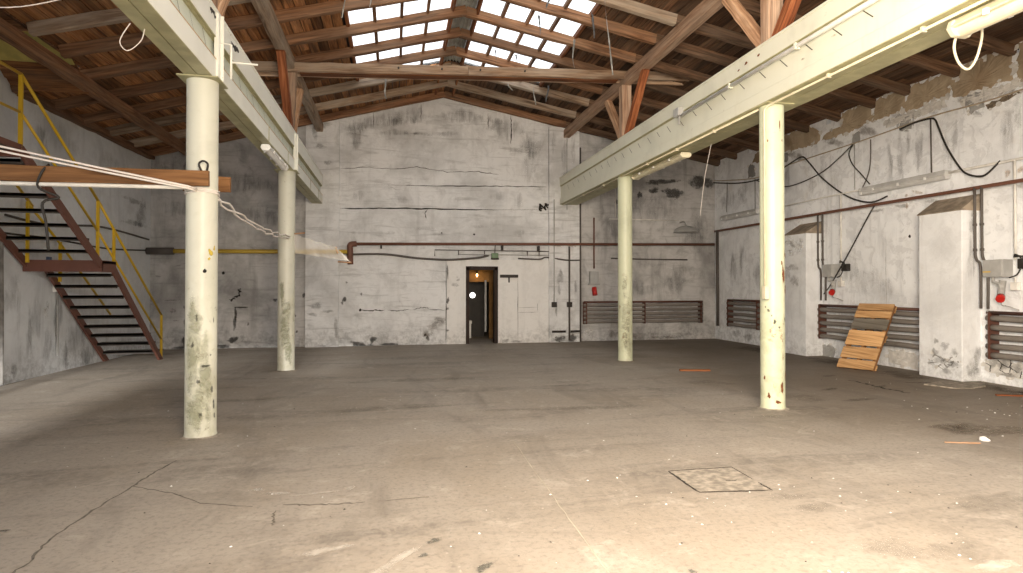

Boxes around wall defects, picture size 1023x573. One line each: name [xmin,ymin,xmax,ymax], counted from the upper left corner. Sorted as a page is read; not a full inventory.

spalling [784,41,1023,163]
leakage [163,303,211,429]
crack [12,460,421,573]